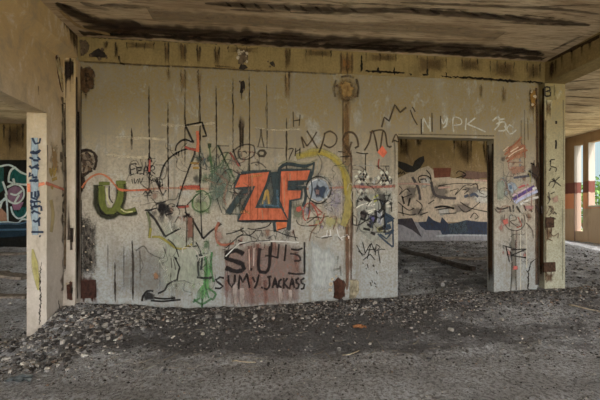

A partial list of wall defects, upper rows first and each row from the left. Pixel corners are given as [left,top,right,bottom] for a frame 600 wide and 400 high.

leakage [148,2,502,39]
leakage [96,27,336,84]
spalling [236,49,248,70]
leakage [548,34,600,69]
rust [80,66,96,98]
leakage [394,134,494,163]
leakage [61,58,97,298]
rust [342,104,353,290]
rust [533,88,553,285]